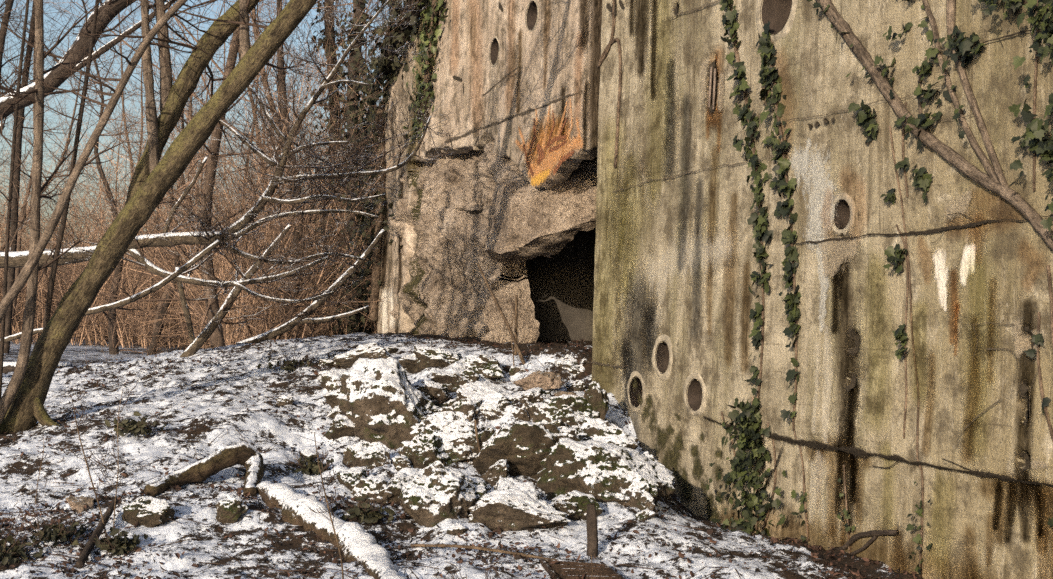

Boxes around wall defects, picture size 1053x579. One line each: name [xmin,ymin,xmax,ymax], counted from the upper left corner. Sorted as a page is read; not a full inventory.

spalling [380,140,597,344]
water stain [791,139,858,526]
water stain [993,302,1043,542]